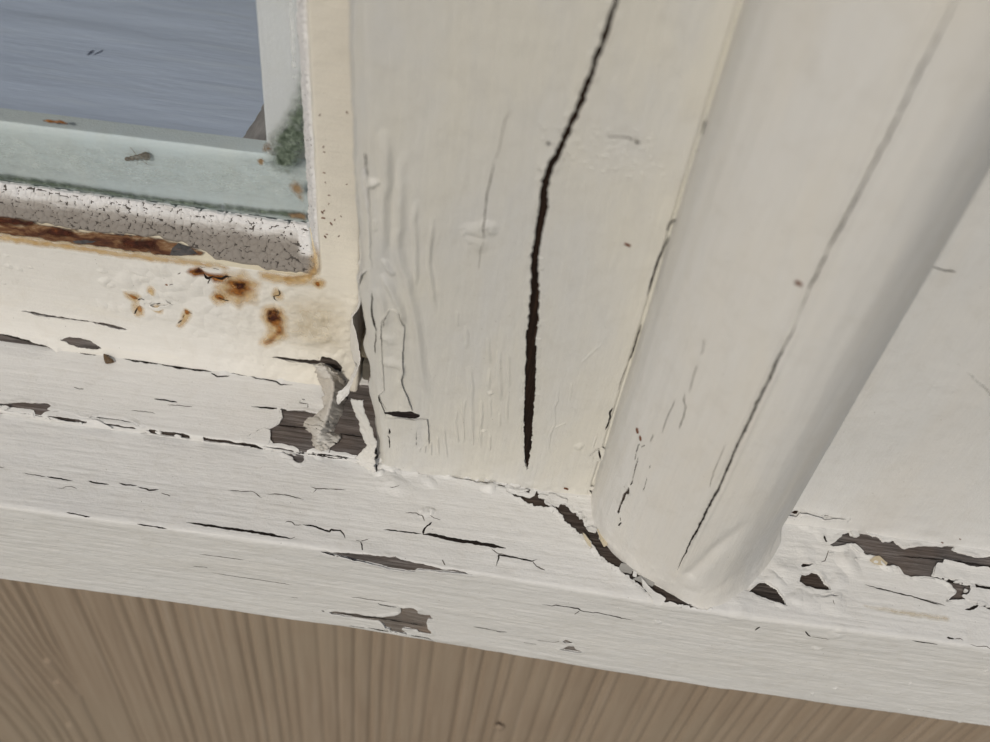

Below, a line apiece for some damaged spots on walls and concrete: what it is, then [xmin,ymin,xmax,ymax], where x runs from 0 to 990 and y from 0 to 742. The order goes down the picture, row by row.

crack [0,184,315,301]
rust [0,217,323,303]
crack [376,0,626,498]
rust [127,289,153,314]
rust [263,308,285,344]
peeling [239,168,429,472]
crack [1,467,170,496]
crack [138,487,544,570]
peeling [323,597,436,639]
peeling [739,576,792,610]
peeling [794,556,837,596]
peeling [827,529,990,608]